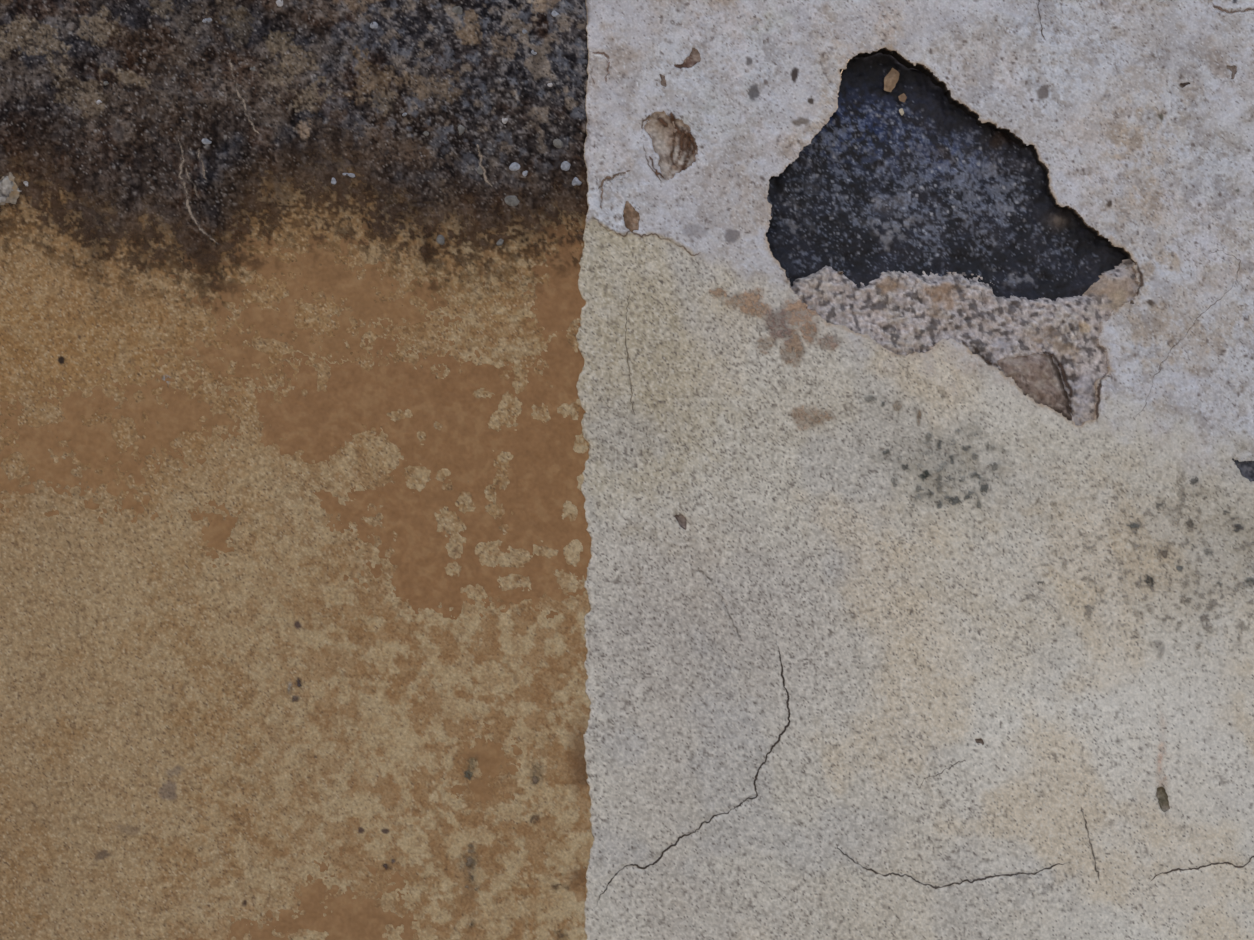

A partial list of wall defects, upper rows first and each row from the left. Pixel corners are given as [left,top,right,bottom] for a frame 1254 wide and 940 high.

crack [1212,6,1254,14]
leakage [0,0,588,292]
spalling [766,47,1144,426]
crack [599,648,790,898]
crack [837,846,1064,889]
crack [1081,809,1099,878]
crack [1151,856,1254,881]